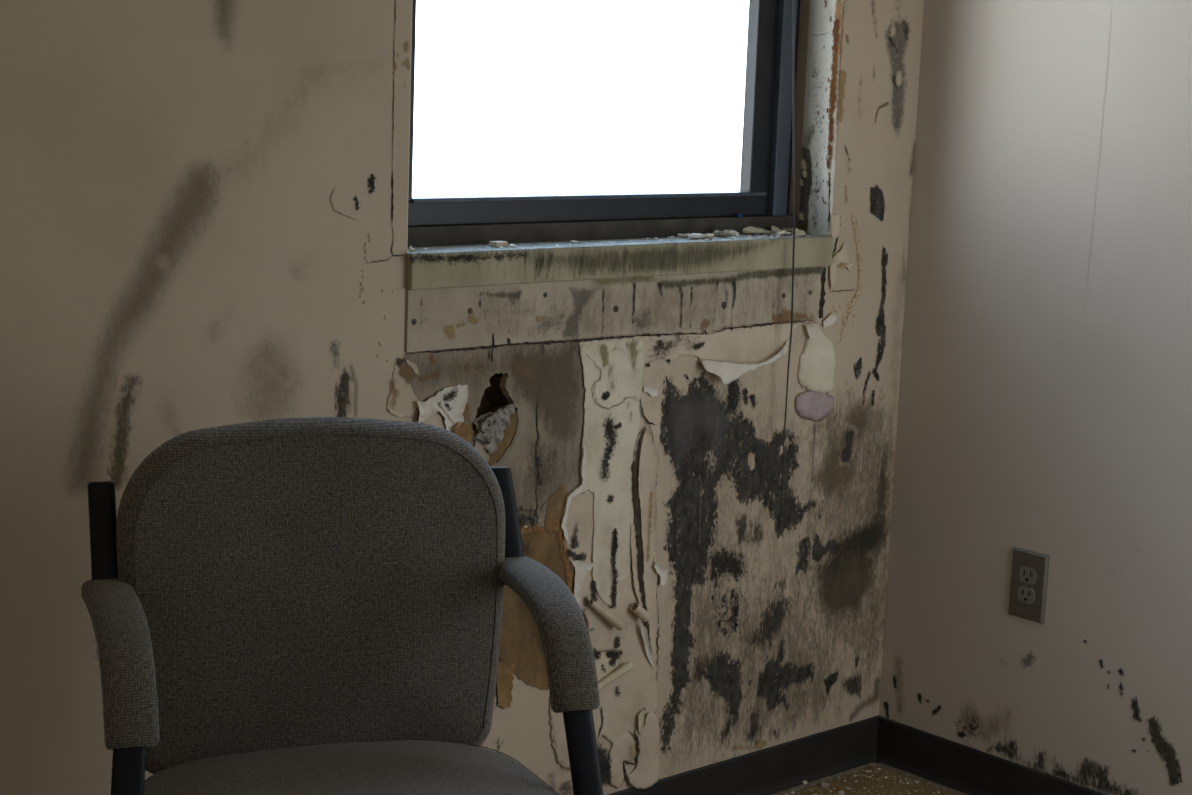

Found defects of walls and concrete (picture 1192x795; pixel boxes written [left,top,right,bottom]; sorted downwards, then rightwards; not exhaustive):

corrosion [829,0,850,161]
leakage [875,22,909,129]
leakage [108,378,135,488]
leakage [335,366,358,417]
peeling [386,322,799,787]
leakage [658,246,890,753]
leakage [987,740,1138,795]
leakage [1099,659,1182,785]